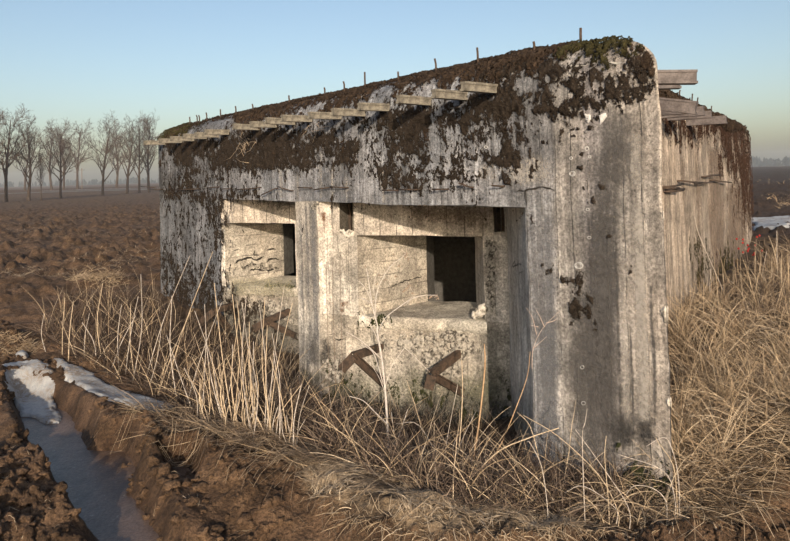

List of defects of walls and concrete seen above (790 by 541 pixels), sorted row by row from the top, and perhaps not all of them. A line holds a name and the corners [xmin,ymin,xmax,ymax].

leakage [512,160,548,182]
leakage [696,149,745,280]
spalling [380,330,483,378]
leakage [534,219,558,462]
leakage [569,117,657,462]